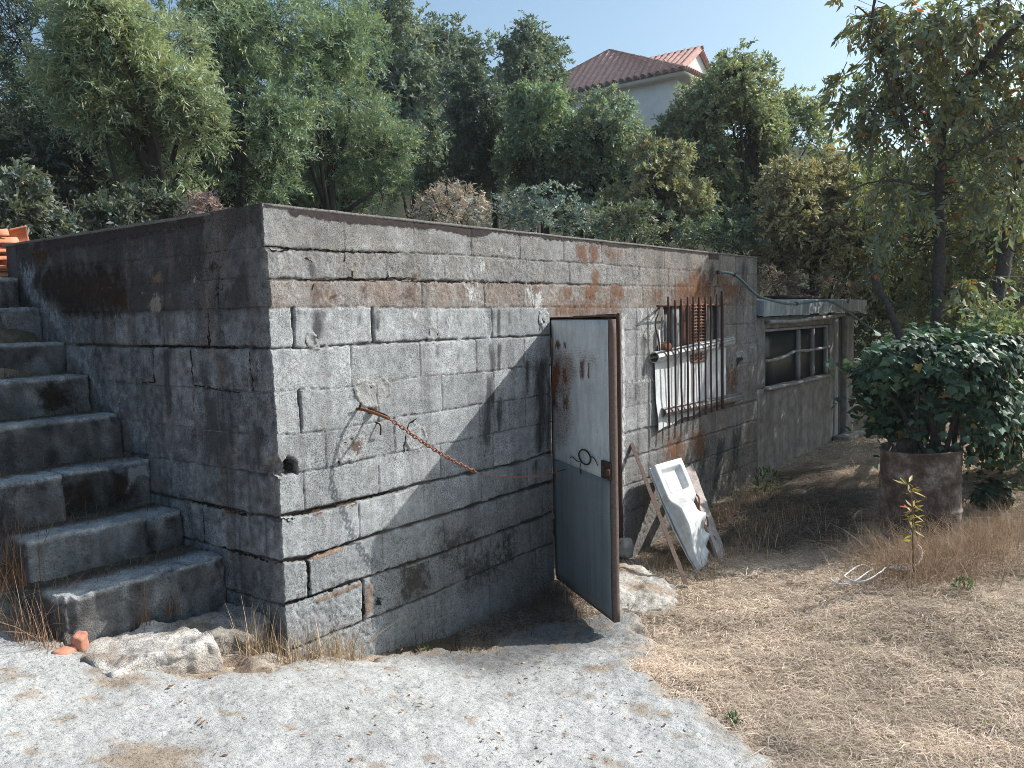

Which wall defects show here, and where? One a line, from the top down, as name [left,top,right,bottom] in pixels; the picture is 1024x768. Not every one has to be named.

corrosion [556,244,624,314]
leakage [20,262,148,446]
leakage [484,310,502,445]
corrosion [551,340,568,410]
spalling [273,459,294,480]
leakage [526,359,551,472]
corrosion [665,429,704,459]